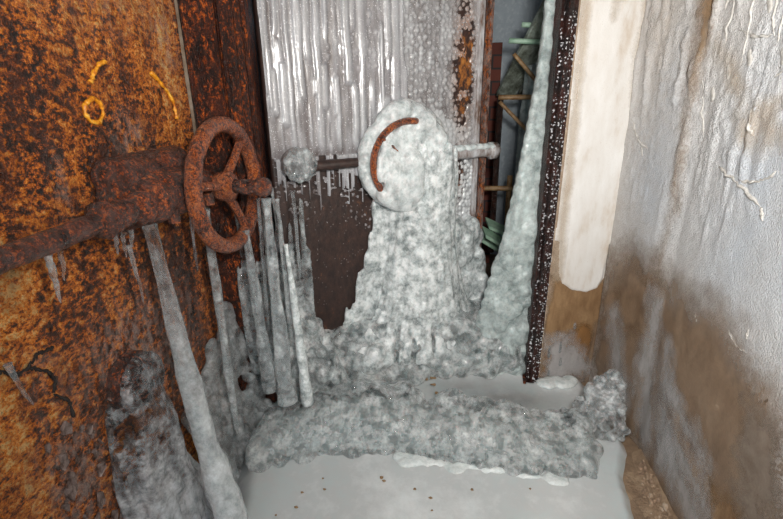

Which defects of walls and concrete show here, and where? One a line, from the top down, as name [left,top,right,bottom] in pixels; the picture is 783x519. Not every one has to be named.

crack [0,345,76,418]
leakage [541,253,783,519]
rust [60,421,107,477]